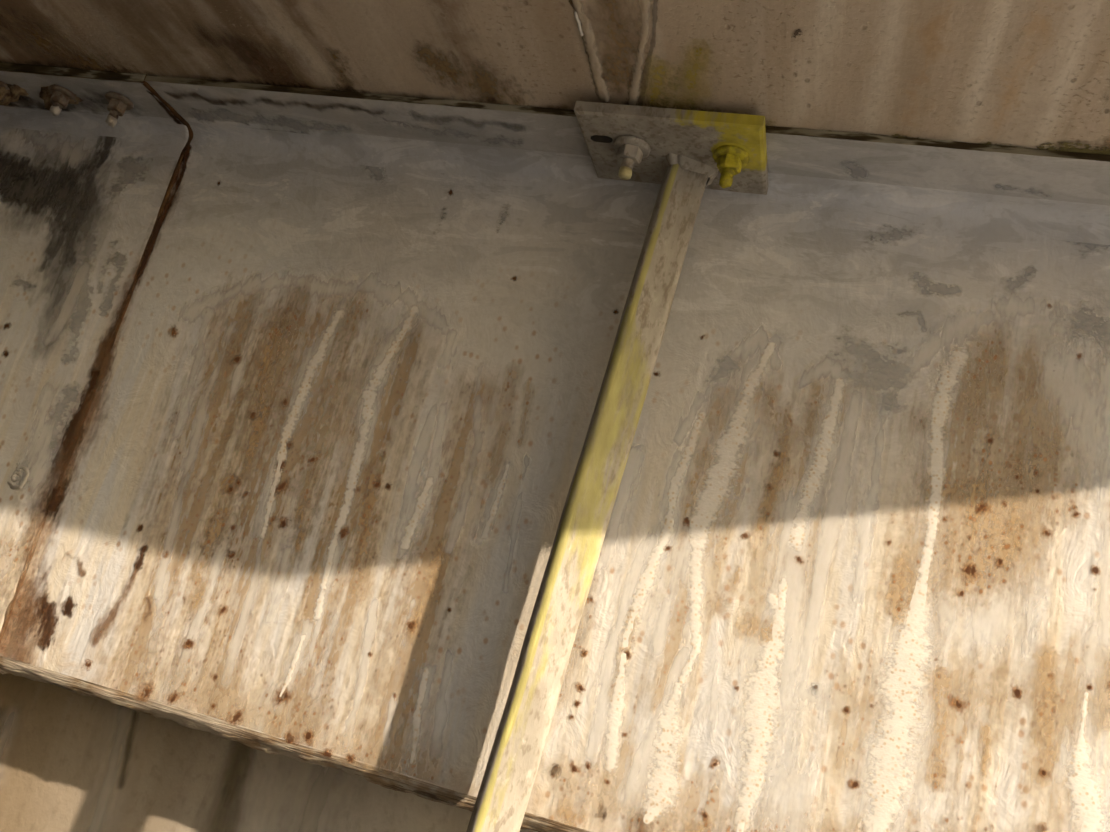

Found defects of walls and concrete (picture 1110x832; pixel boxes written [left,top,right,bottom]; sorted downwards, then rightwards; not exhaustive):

damp [0,129,126,363]
rust [0,144,191,664]
rust [112,286,533,780]
rust [551,731,631,825]
crack [569,0,658,106]
damp [587,329,779,825]
rust [654,382,821,708]
damp [734,359,859,832]
damp [855,297,1033,832]
rust [916,651,990,789]
rust [887,330,1080,621]
damp [1045,308,1110,832]